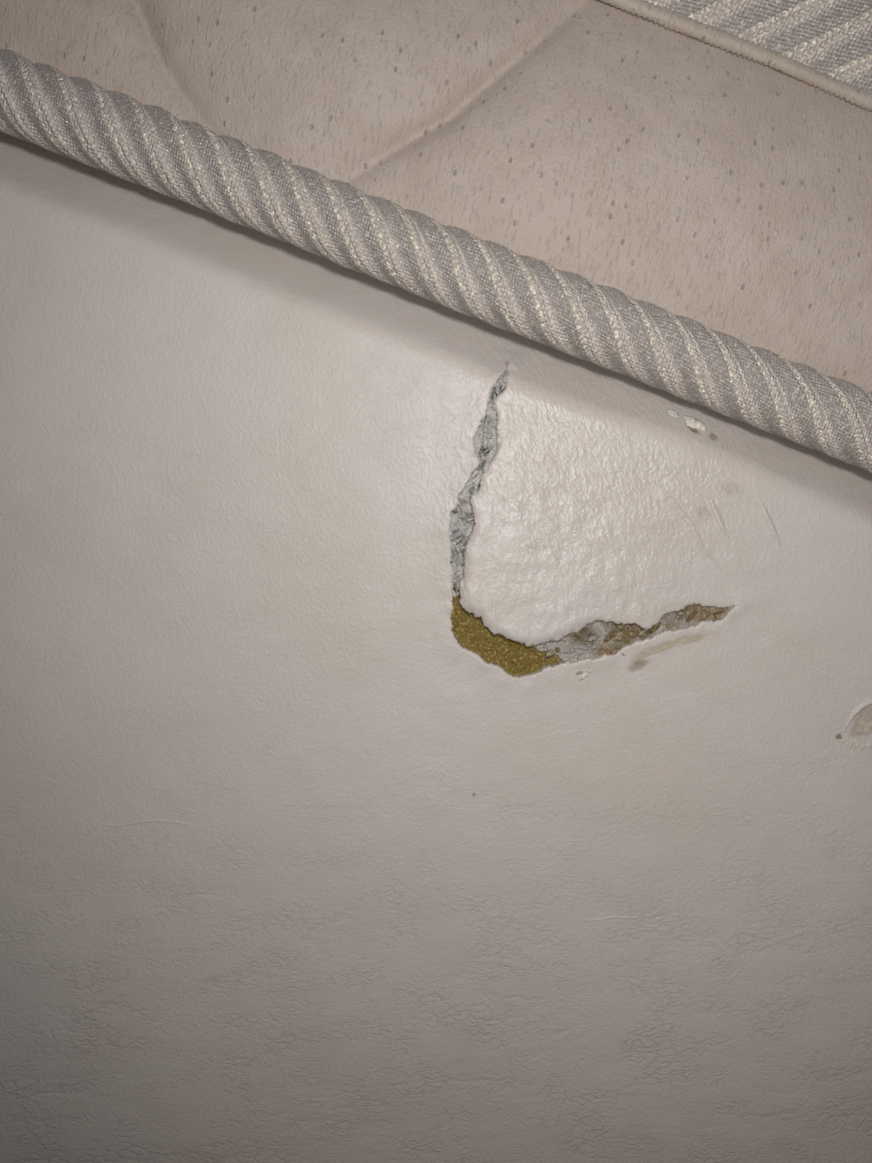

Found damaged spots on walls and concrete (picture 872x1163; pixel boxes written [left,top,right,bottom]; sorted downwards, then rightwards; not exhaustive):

peeling [667,409,715,439]